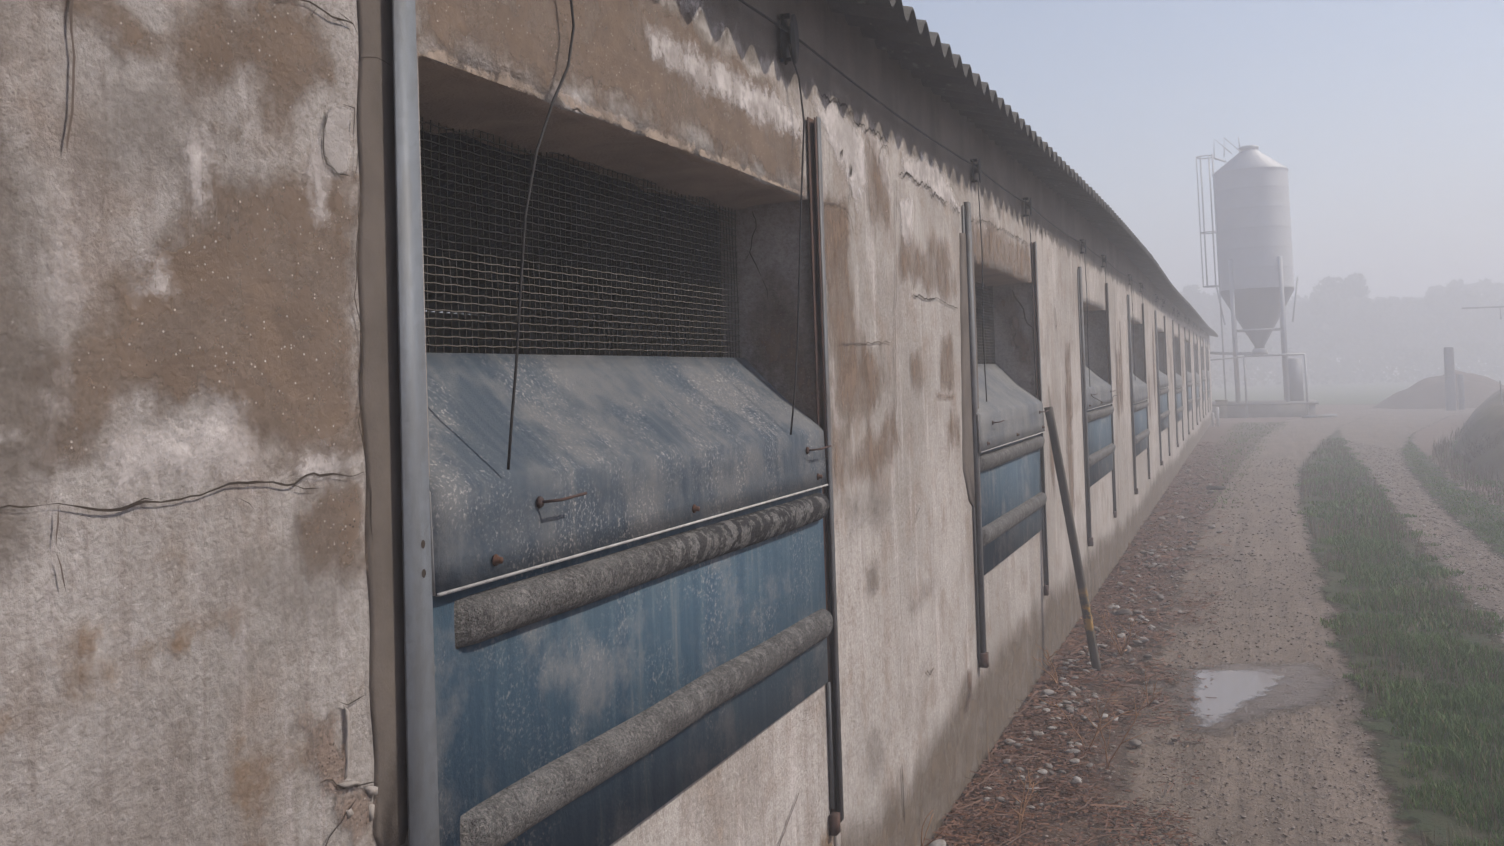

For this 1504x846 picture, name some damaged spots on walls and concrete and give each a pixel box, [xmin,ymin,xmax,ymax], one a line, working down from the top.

crack [66,0,76,149]
leakage [64,0,158,55]
leakage [0,134,360,483]
crack [0,113,373,591]
leakage [177,0,334,115]
leakage [417,0,801,179]
leakage [816,101,960,485]
crack [746,89,1049,300]
leakage [300,481,365,573]
leakage [846,416,1211,846]